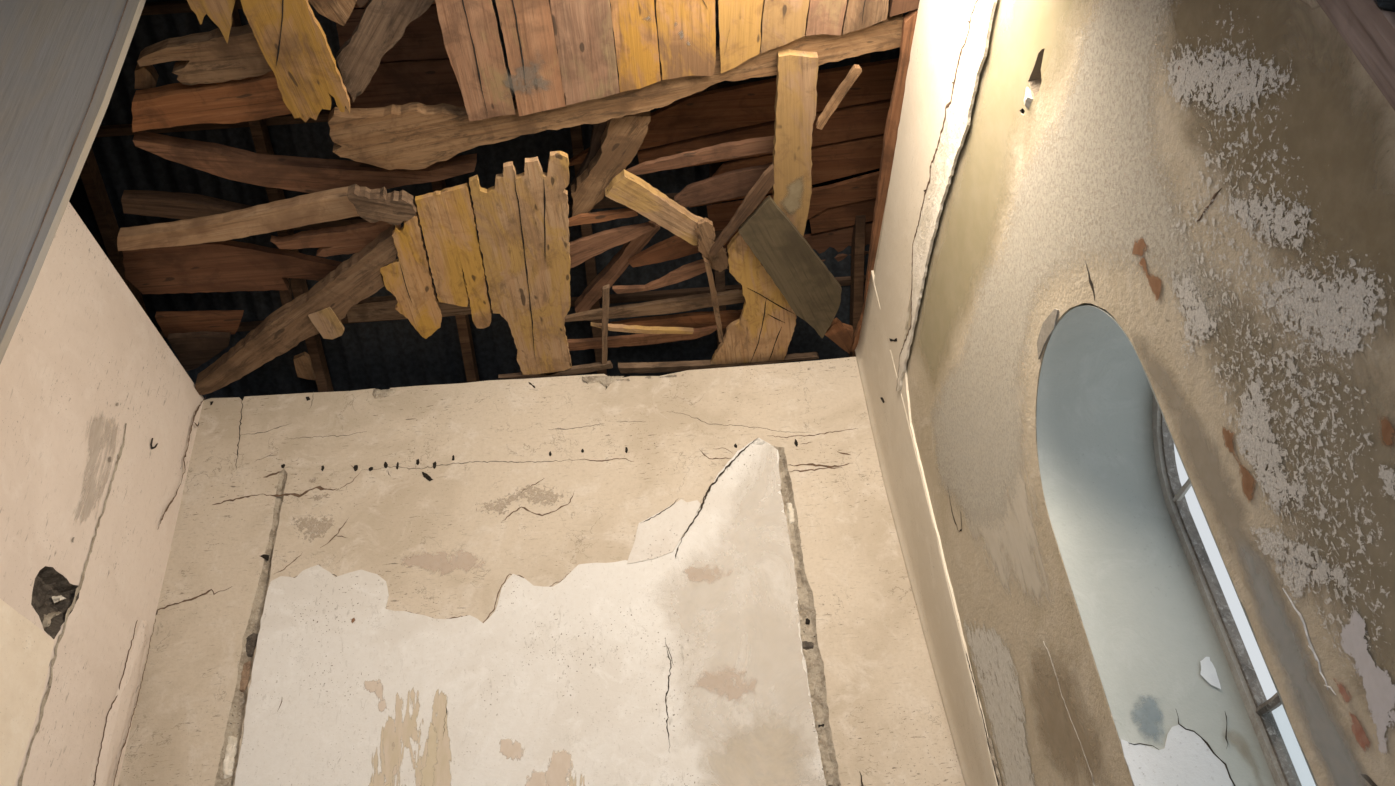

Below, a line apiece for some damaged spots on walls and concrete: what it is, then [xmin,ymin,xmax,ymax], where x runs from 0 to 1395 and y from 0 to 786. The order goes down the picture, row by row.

spalling [1020,48,1045,114]
corrosion [1132,238,1161,300]
damp [920,0,1395,685]
corrosion [1222,427,1255,501]
peeling [0,423,127,786]
peeling [223,438,833,786]
crack [93,587,231,786]
damp [1034,663,1099,780]
spalling [1120,725,1233,786]